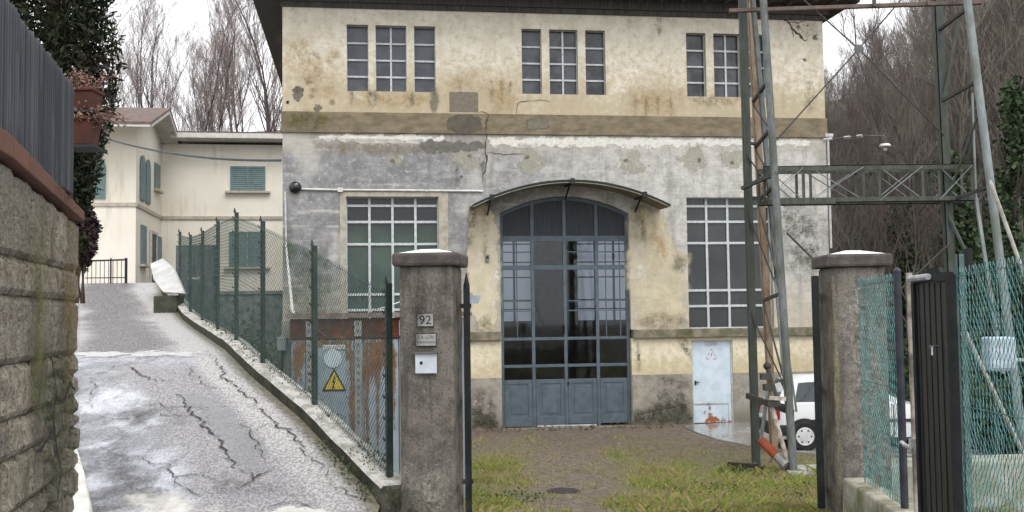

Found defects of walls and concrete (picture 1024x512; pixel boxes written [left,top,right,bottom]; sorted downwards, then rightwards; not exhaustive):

crack [784,20,808,41]
spalling [292,81,333,112]
crack [478,111,524,181]
peeling [319,115,754,164]
peeling [768,138,811,149]
rust [292,338,399,454]